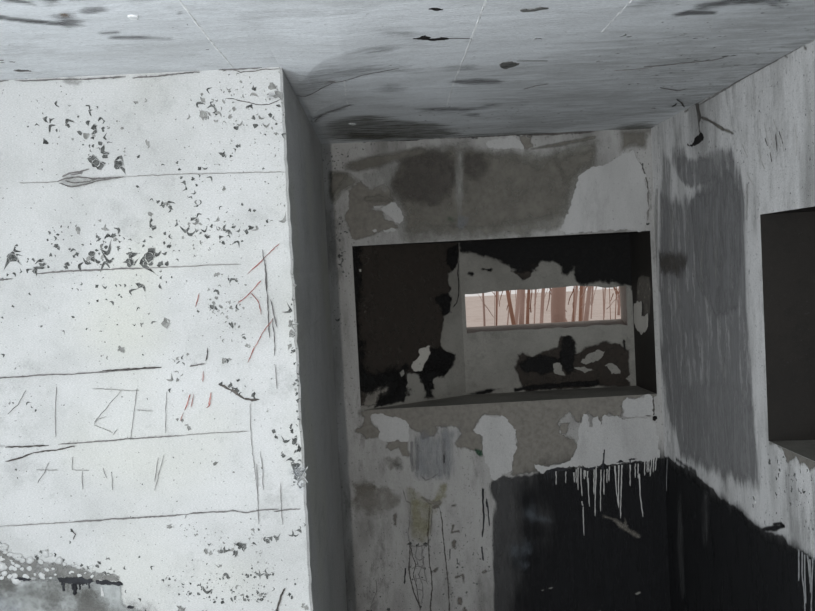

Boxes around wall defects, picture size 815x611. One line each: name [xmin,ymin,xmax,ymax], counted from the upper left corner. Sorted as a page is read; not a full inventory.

peeling [486,126,595,149]
spalling [0,73,288,306]
peeling [560,151,650,234]
spalling [134,307,171,329]
spalling [196,272,251,348]
peeling [634,277,651,335]
spalling [166,353,190,393]
spalling [271,299,308,489]
peeling [400,345,430,377]
peeling [553,363,565,376]
peeling [574,350,635,382]
peeling [355,394,660,480]